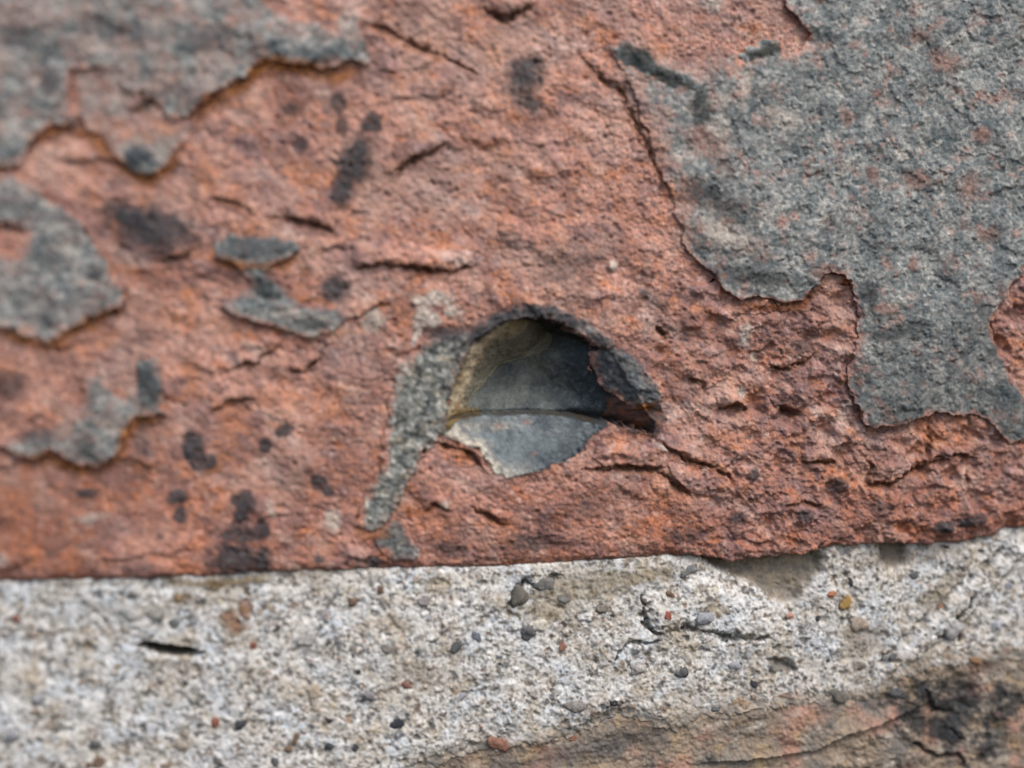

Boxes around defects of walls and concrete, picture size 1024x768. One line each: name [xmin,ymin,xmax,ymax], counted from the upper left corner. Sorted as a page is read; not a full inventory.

spalling [0,0,1024,562]